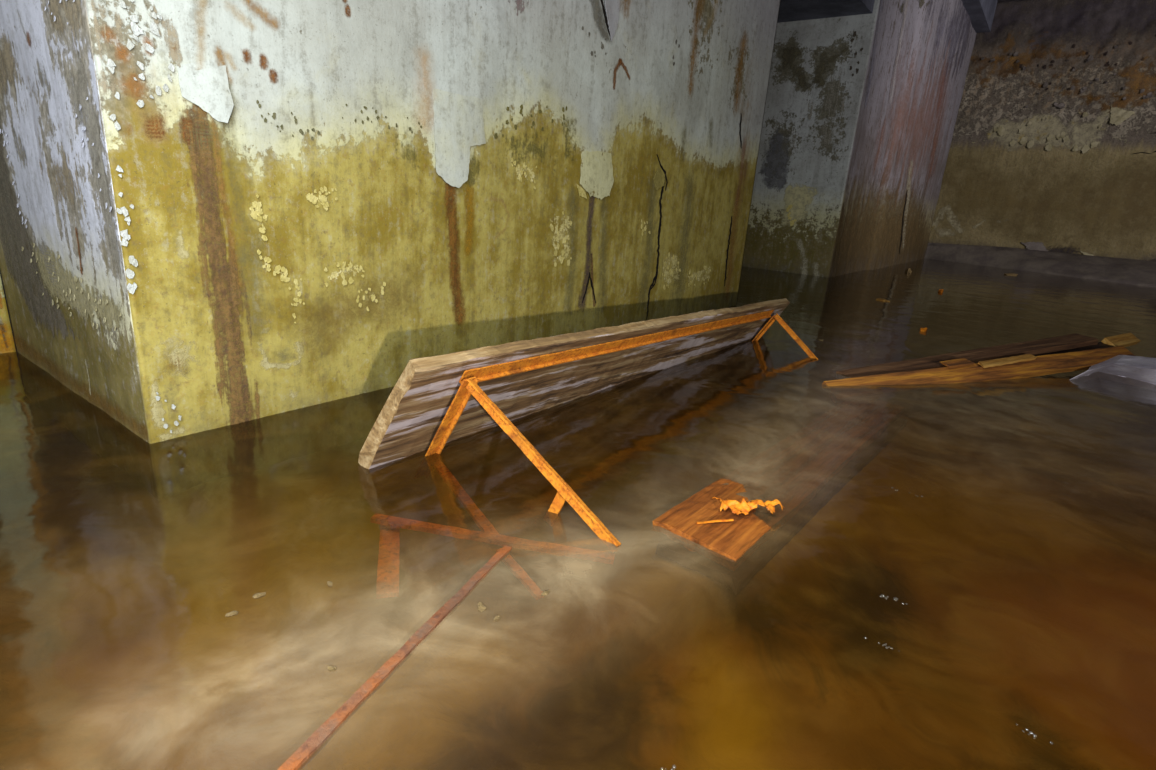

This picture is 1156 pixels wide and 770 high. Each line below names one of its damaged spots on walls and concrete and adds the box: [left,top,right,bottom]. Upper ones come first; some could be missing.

rust [243,50,277,83]
rust [689,0,702,93]
rust [146,117,165,140]
rust [179,103,260,444]
rust [445,183,473,325]
crack [644,154,668,320]
water stain [761,130,817,226]
water stain [835,173,1156,275]